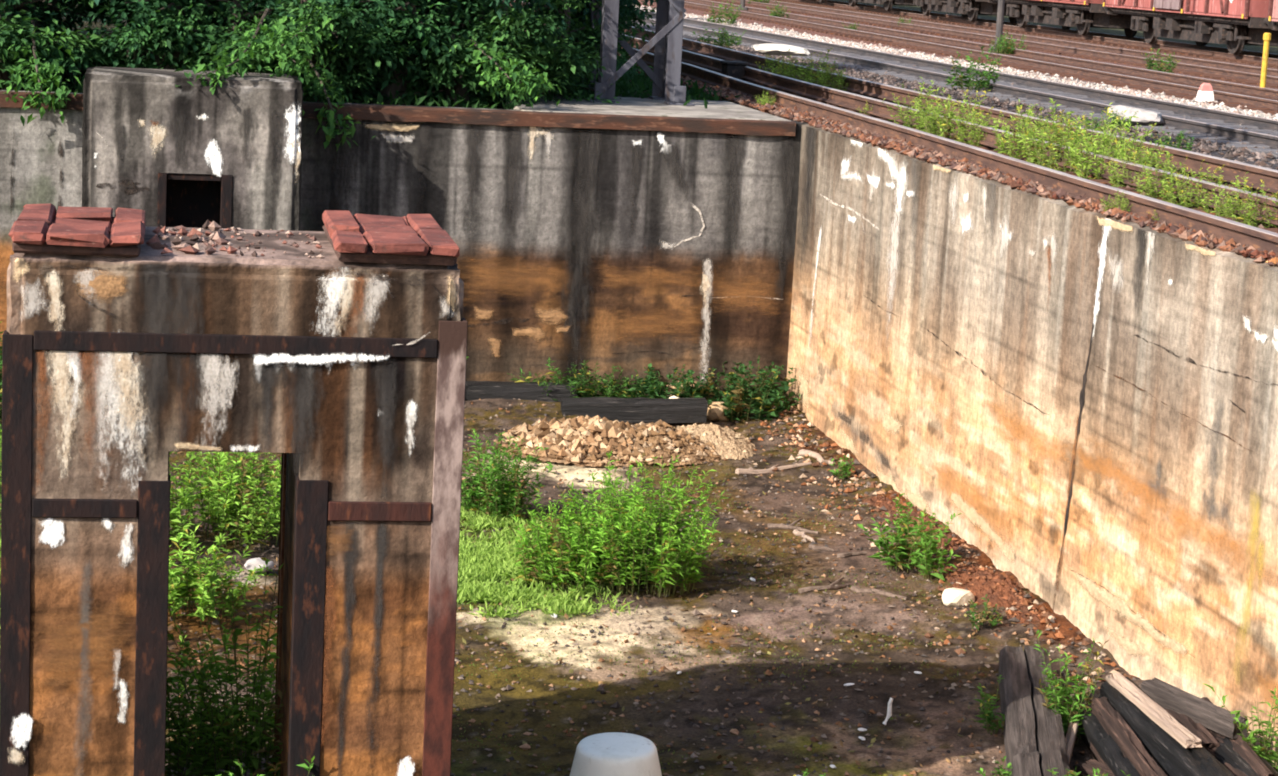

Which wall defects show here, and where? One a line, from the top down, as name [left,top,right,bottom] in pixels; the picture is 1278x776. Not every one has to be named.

efflorescence [46,271,64,331]
leakage [204,139,222,177]
leakage [240,105,301,187]
efflorescence [316,270,386,334]
leakage [504,126,551,223]
efflorescence [700,260,711,379]
leakage [841,148,916,300]
leakage [1093,218,1154,336]
leakage [36,350,234,474]
leakage [254,332,430,471]
crack [928,313,1278,603]
rust [321,567,336,739]